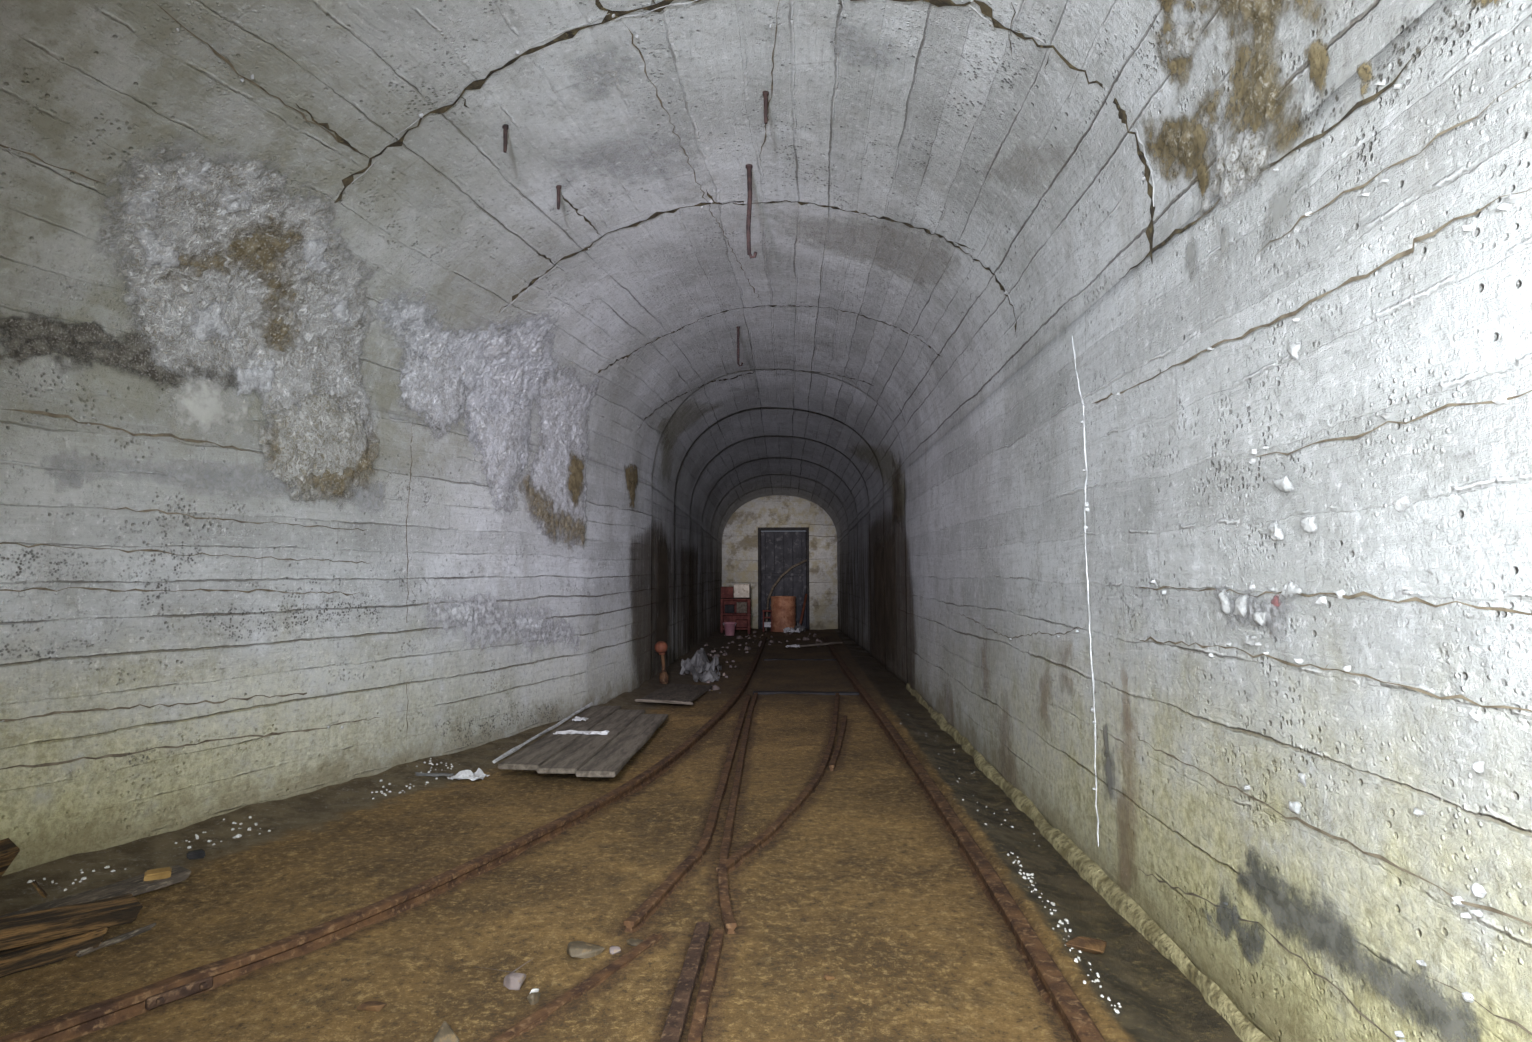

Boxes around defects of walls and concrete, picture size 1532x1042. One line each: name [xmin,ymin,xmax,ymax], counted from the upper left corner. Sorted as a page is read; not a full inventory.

crack [152,0,1017,374]
crack [893,0,1427,279]
spalling [1161,17,1204,61]
spalling [1199,116,1272,215]
spalling [1298,88,1342,134]
crack [1254,77,1531,257]
spalling [1378,2,1463,87]
leakage [102,147,599,549]
crack [0,422,417,621]
crack [959,188,1532,847]
crack [0,684,408,770]
leakage [1204,849,1480,1042]